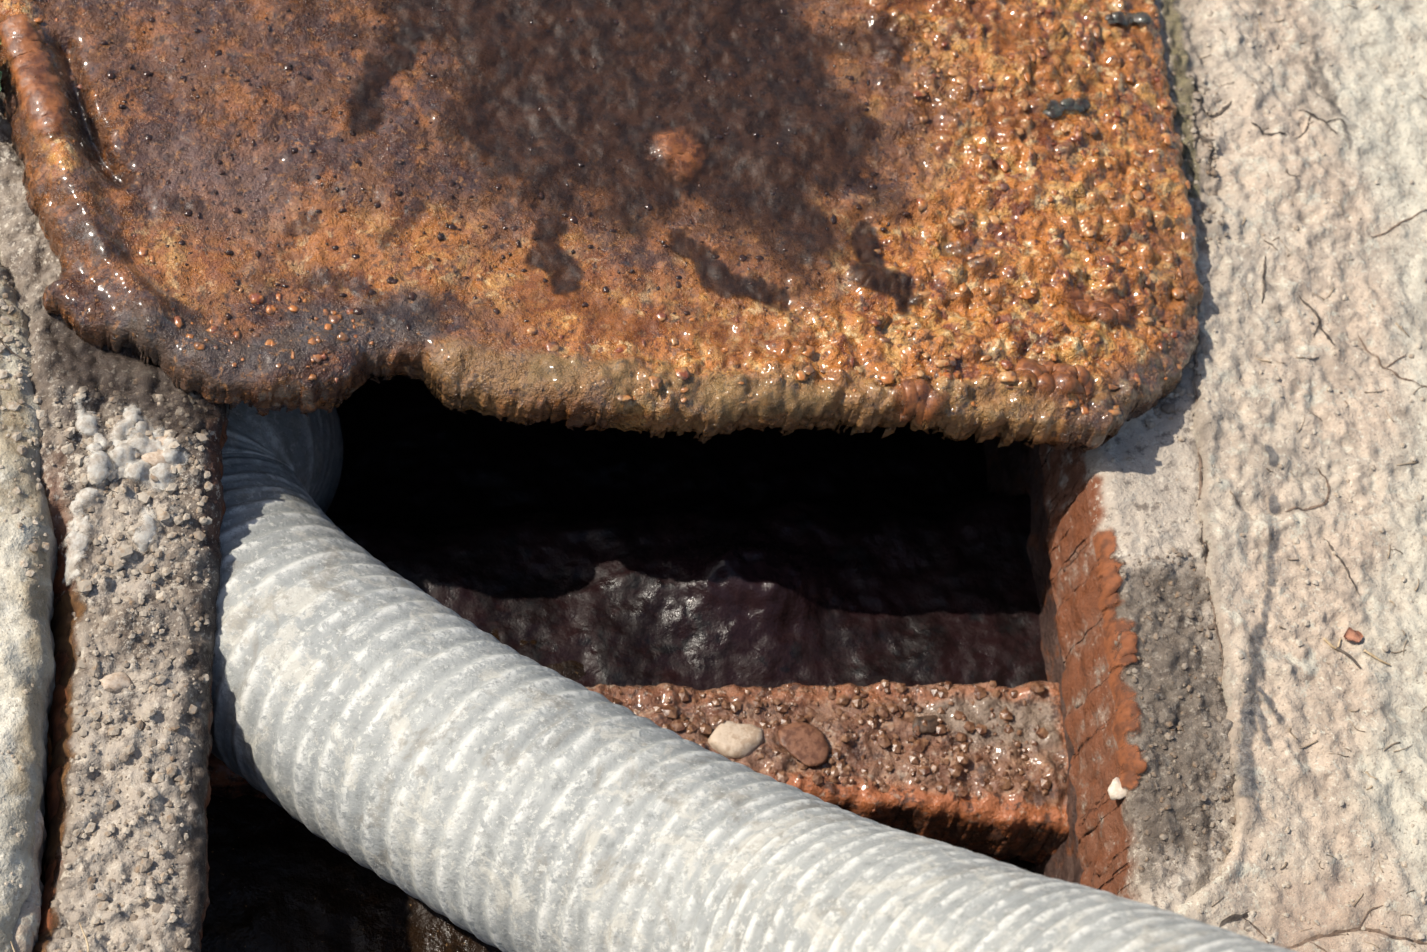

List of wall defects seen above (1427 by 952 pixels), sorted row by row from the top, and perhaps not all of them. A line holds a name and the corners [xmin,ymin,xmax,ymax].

corrosion [46,313,226,431]
corrosion [33,591,86,952]
corrosion [1093,530,1147,789]
damp [1236,533,1283,798]
crack [1219,905,1427,952]